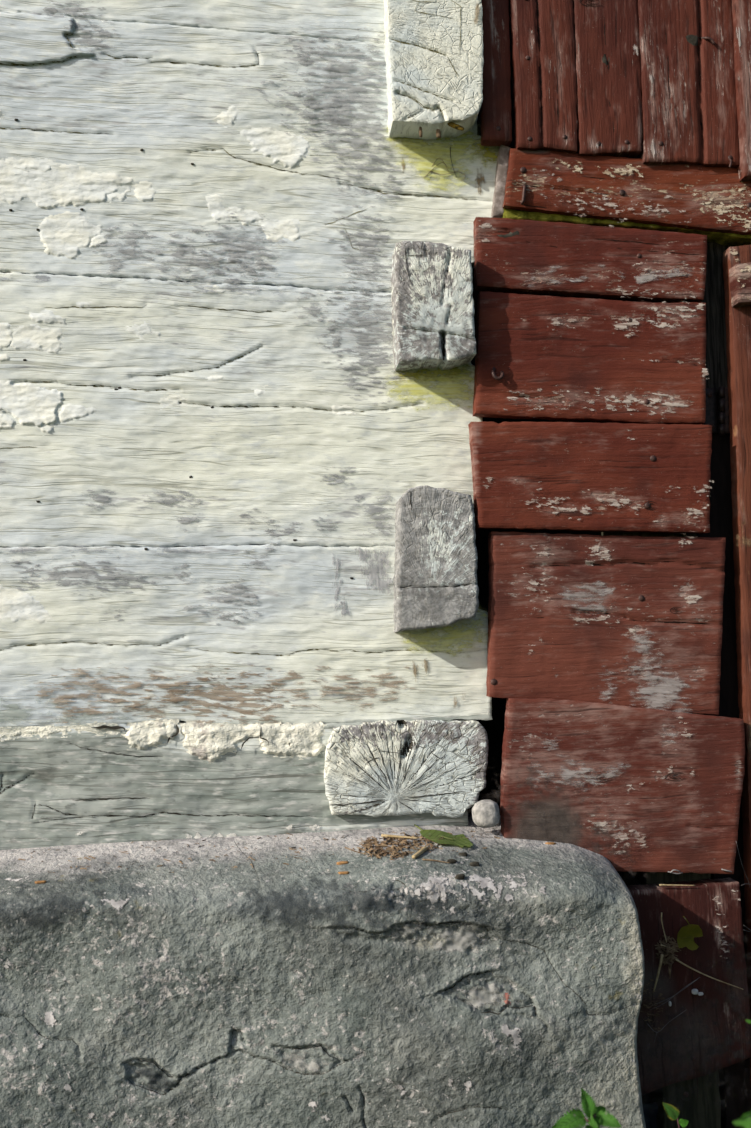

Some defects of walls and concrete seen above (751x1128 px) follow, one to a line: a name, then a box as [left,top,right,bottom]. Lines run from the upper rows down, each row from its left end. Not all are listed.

peeling [213,103,310,170]
peeling [0,155,159,260]
damp [257,28,499,406]
peeling [521,158,583,199]
peeling [567,164,751,232]
peeling [0,380,99,436]
damp [0,614,487,729]
spalling [0,718,327,764]
crack [0,725,481,880]
crack [330,880,637,1016]
crack [124,1030,344,1095]